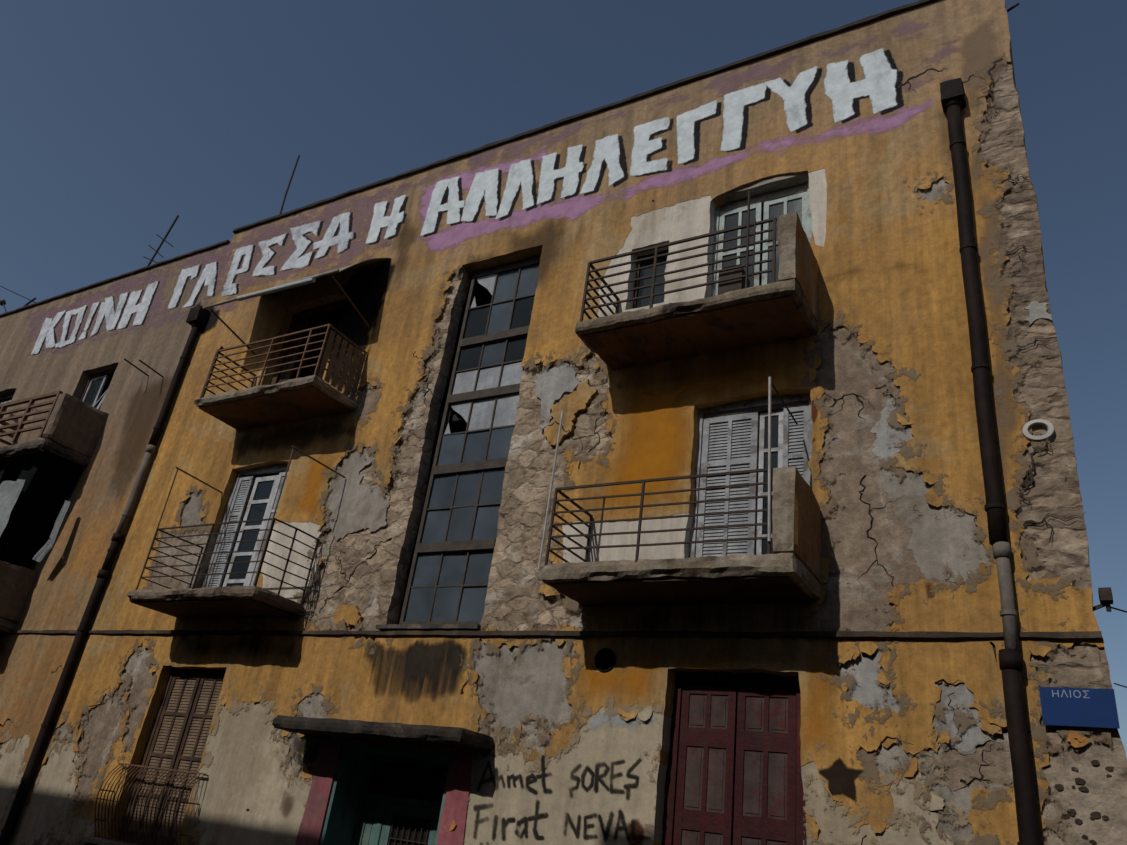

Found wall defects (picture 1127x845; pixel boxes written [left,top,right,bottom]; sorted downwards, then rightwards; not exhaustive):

peeling [808,169,827,247]
flaking render [903,163,954,215]
peeling [0,637,159,845]
peeling [143,477,217,590]
peeling [185,679,339,845]
flaking render [259,255,474,655]
damp [368,640,465,701]
peeling [449,342,693,845]
crack [858,475,894,587]
flaking render [801,311,1014,845]
flaking render [971,52,1127,845]